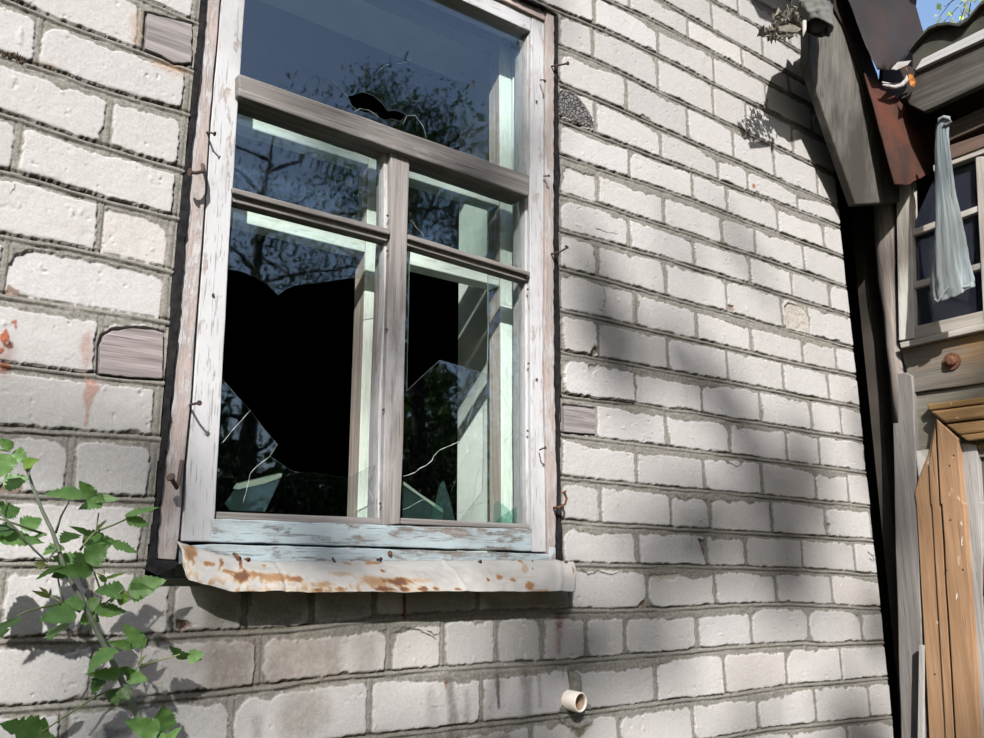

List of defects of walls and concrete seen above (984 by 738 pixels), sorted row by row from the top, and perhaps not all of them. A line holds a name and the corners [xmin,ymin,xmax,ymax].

corrosion [0,320,17,369]